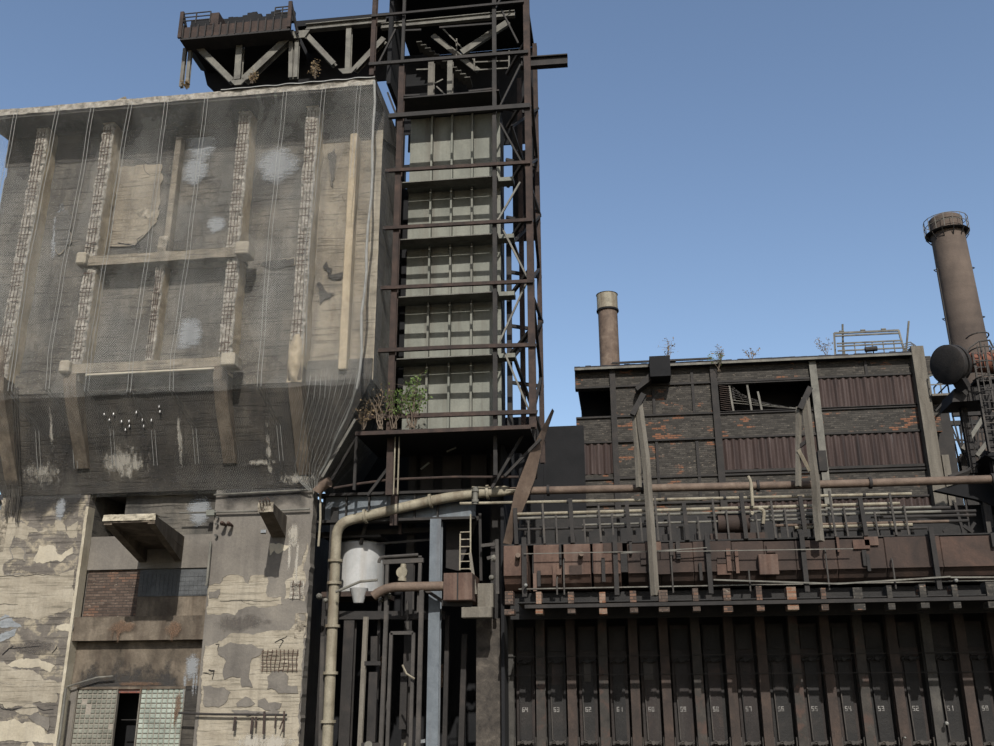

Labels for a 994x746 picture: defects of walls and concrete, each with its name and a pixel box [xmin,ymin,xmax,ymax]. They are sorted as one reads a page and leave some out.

peeling [0,499,78,643]
peeling [206,543,308,615]
peeling [0,658,62,746]
peeling [195,613,308,746]